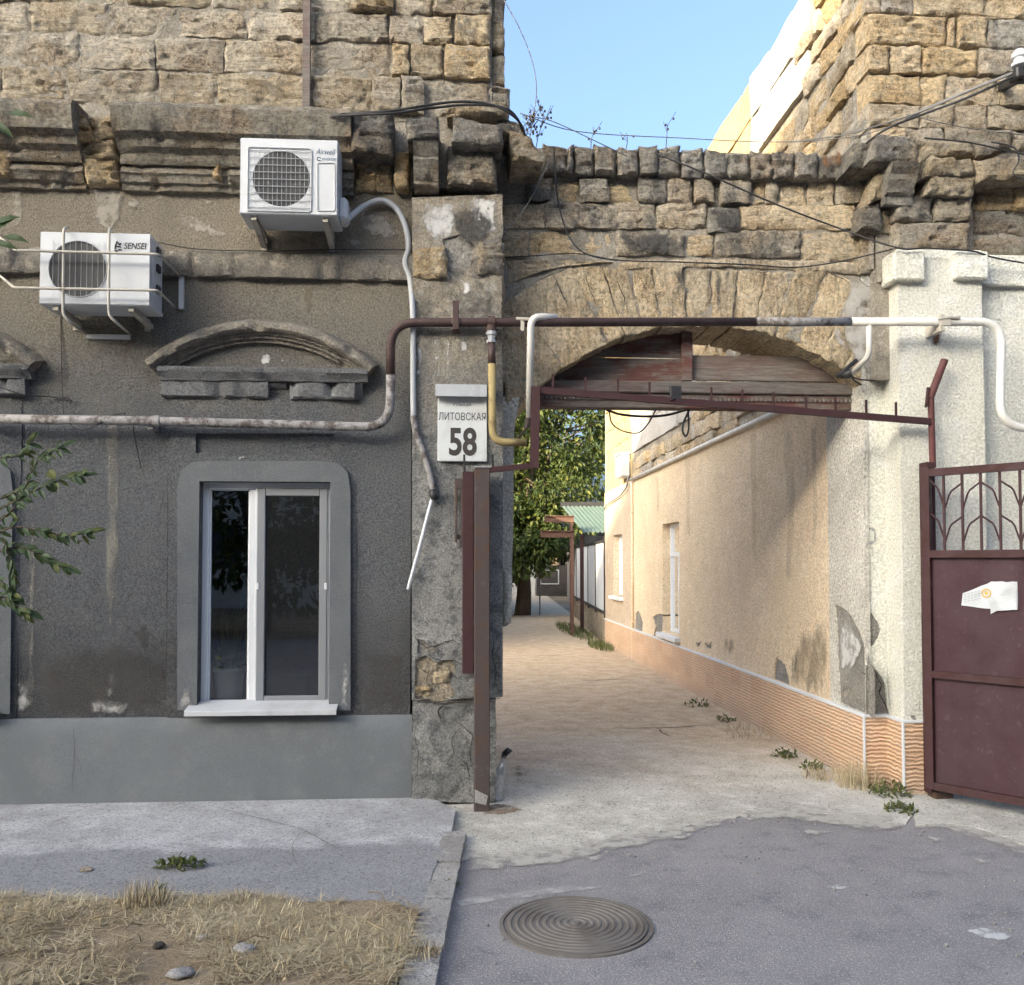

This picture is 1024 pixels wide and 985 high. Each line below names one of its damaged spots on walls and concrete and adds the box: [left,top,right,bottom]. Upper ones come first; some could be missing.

flaking render [414,639,456,701]
crack [414,639,501,779]
flaking render [775,659,789,685]
flaking render [836,605,888,718]